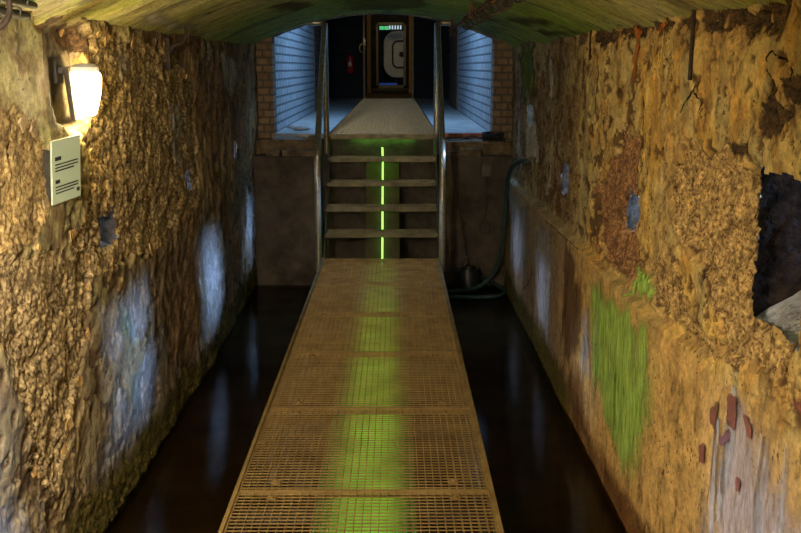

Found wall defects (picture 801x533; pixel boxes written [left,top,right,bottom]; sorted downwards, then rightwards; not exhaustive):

spalling [755,73,801,144]
crack [766,50,793,109]
spalling [0,16,200,502]
spalling [593,124,795,378]
flaking render [719,394,751,445]